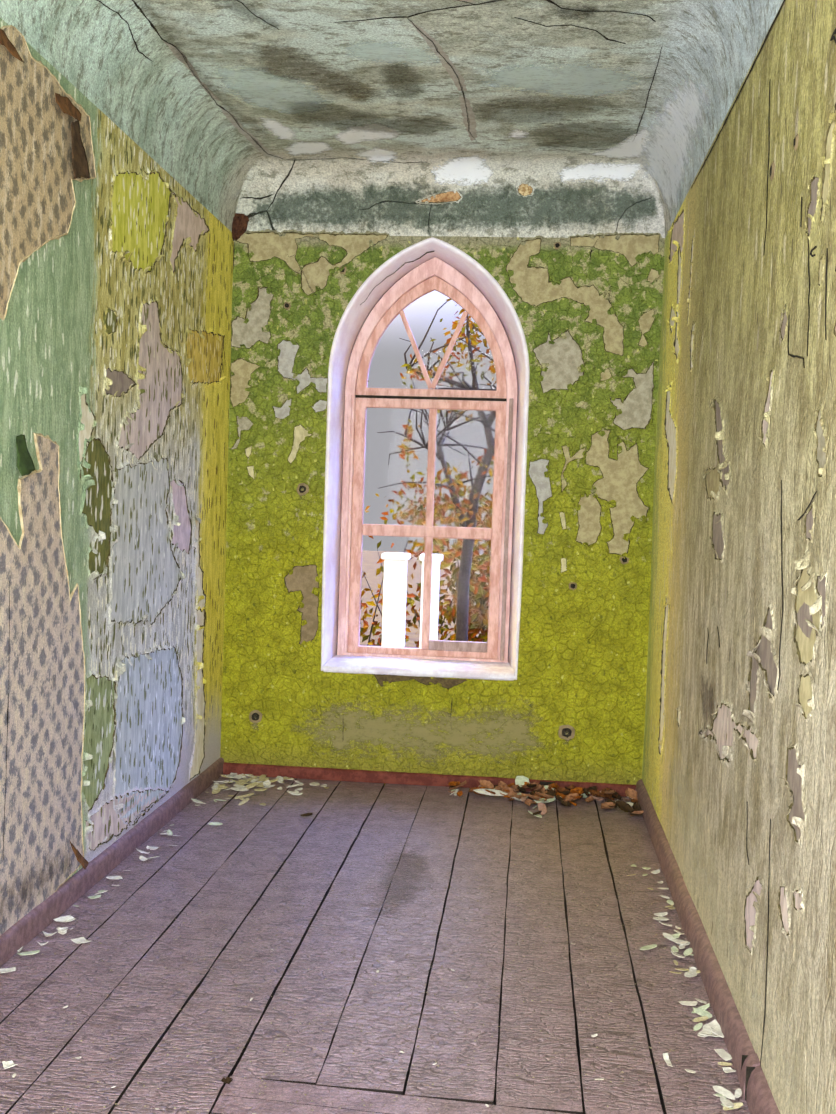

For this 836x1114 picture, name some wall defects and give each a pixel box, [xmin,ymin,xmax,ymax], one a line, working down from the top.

crack [96,0,420,295]
leakage [254,46,449,134]
crack [358,199,450,305]
leakage [253,182,656,234]
crack [334,0,662,142]
crack [691,0,785,252]
crack [788,197,836,368]
peeling [502,206,696,559]
flaking render [372,674,468,692]
peeling [698,603,779,769]
peeling [791,501,828,722]
peeling [627,864,701,977]